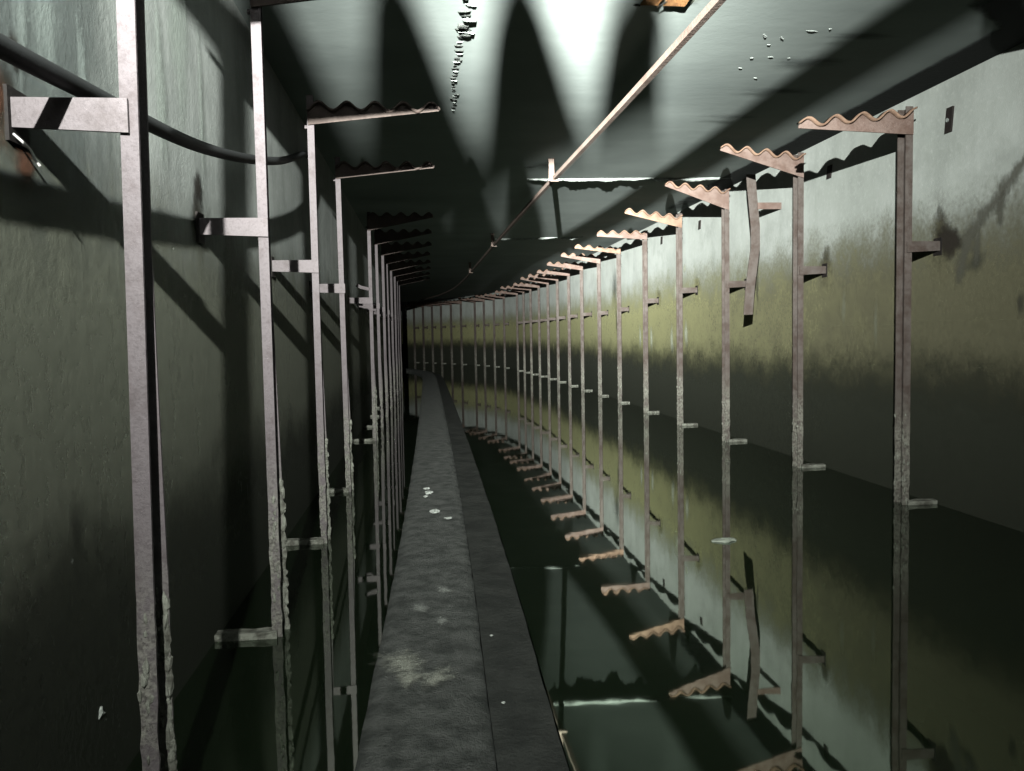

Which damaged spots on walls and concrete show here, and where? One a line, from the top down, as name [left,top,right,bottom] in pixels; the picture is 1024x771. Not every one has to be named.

damp [957,157,1024,281]
damp [280,328,895,538]
damp [909,362,1024,532]
damp [0,530,141,771]
damp [166,438,270,701]